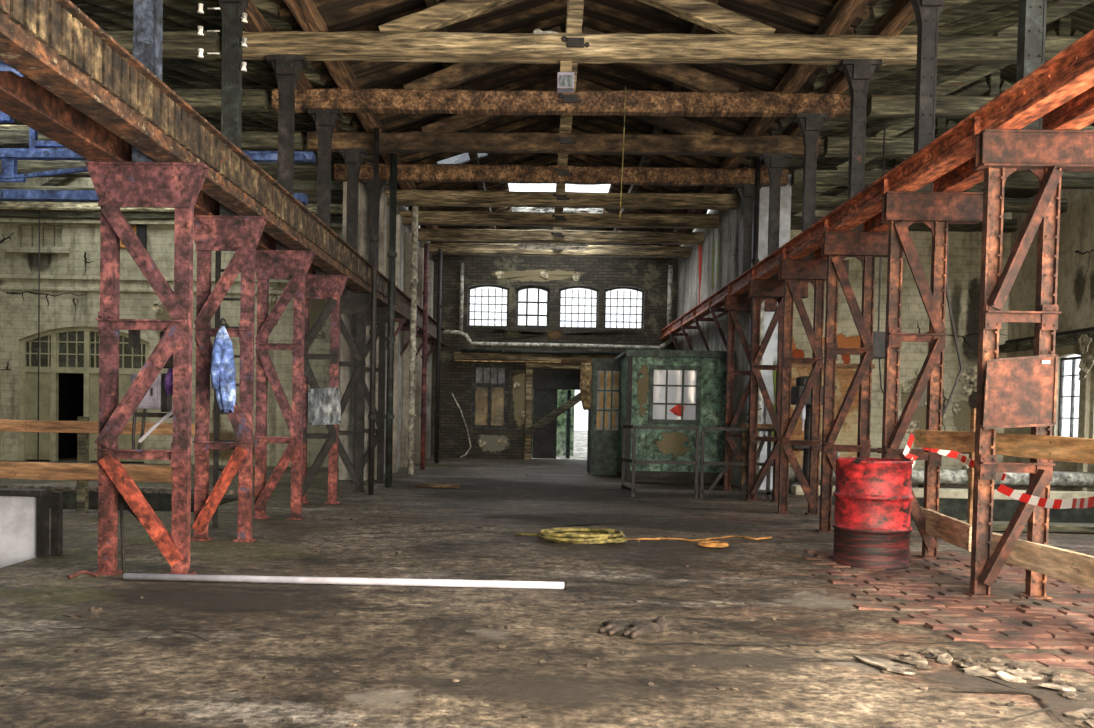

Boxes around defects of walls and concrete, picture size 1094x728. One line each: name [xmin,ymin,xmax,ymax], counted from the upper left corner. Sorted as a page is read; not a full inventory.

spalling [782,648,1094,728]